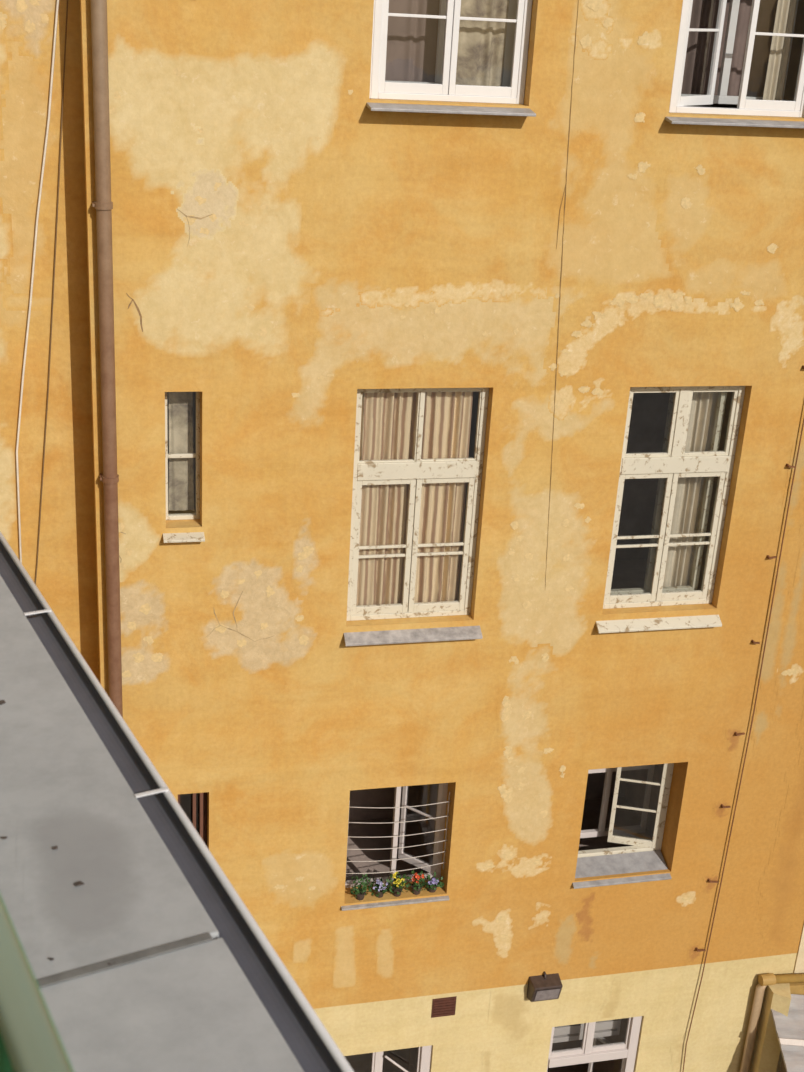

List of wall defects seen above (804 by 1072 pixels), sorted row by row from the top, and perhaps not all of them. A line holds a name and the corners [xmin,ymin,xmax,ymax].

spalling [0,0,60,161]
peeling [567,0,663,60]
peeling [0,197,58,366]
crack [126,293,143,332]
crack [177,209,213,247]
peeling [0,418,22,547]
peeling [108,30,804,879]
crack [205,591,273,642]
leakage [16,806,160,958]
peeling [471,908,514,959]